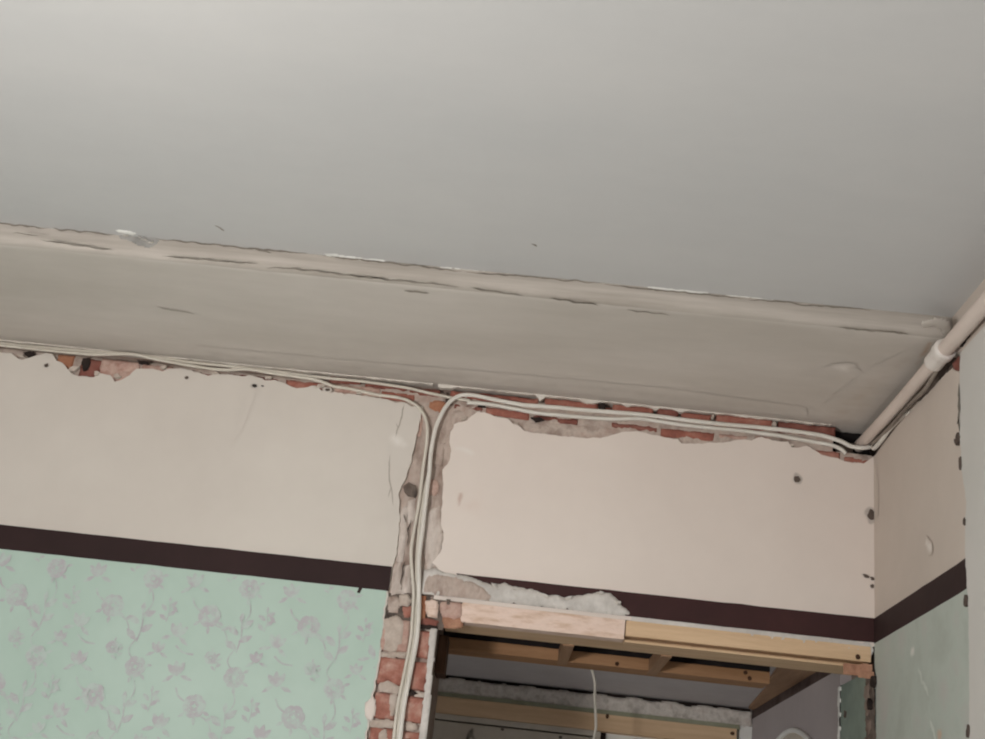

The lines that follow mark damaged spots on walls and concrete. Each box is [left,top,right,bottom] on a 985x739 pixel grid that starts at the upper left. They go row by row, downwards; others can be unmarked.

flaking render [911,335,970,403]
flaking render [0,339,898,463]
crack [954,385,962,429]
flaking render [432,443,446,467]
spalling [403,482,417,498]
flaking render [429,479,439,496]